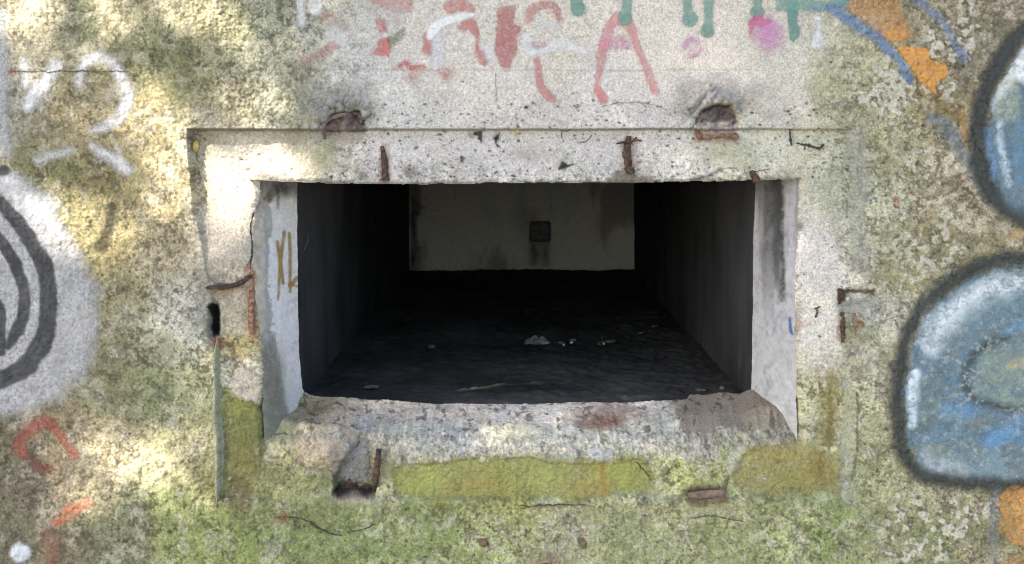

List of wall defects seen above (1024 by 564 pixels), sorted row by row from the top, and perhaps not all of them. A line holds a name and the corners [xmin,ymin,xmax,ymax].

spalling [313,93,373,140]
spalling [684,86,745,134]
damp [771,186,785,301]
spalling [202,282,249,349]
rust [837,288,864,342]
spalling [330,439,382,504]